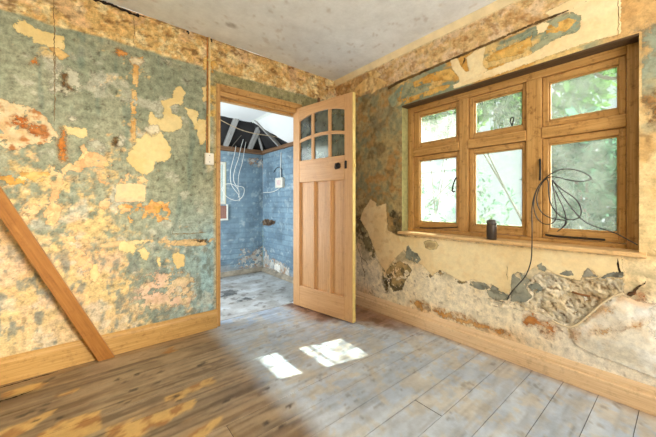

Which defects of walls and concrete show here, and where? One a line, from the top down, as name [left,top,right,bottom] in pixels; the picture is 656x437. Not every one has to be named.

peeling [13,19,70,60]
peeling [485,13,581,70]
peeling [388,68,457,107]
spalling [0,98,112,226]
peeling [98,86,207,223]
peeling [119,240,150,260]
peeling [126,252,195,316]
peeling [236,246,291,276]
peeling [386,245,421,292]
peeling [424,240,439,250]
spalling [455,263,625,328]